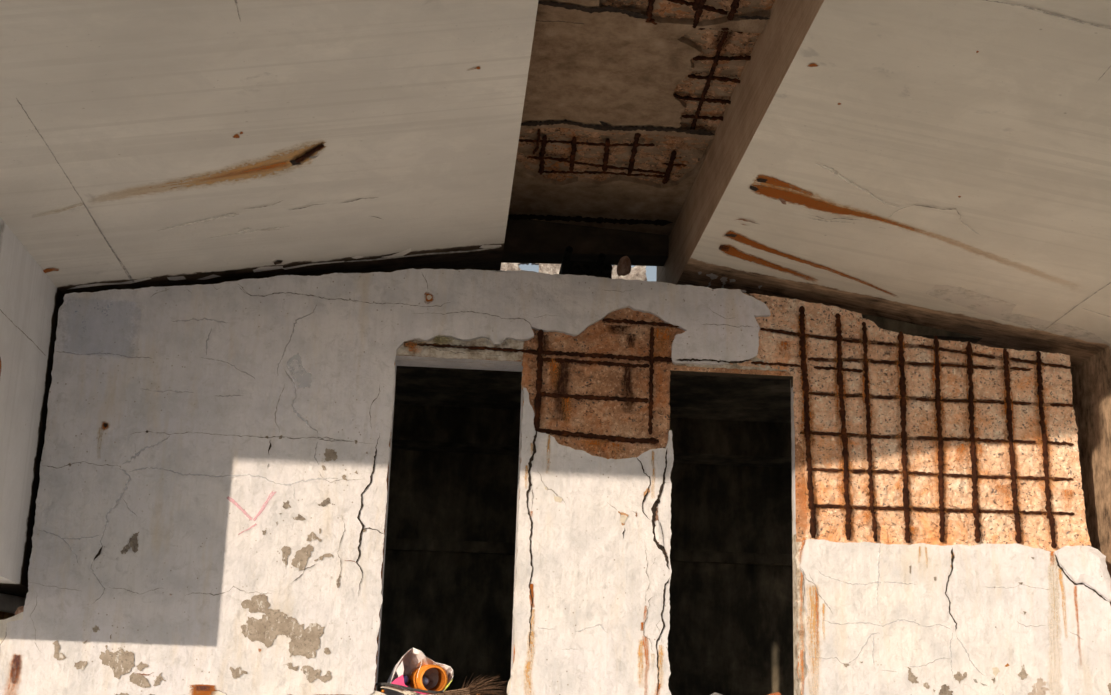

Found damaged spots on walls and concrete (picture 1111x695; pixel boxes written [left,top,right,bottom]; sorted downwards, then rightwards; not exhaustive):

spalling [645,0,751,130]
rust [163,142,325,188]
rust [719,231,892,295]
rust [750,175,933,236]
spalling [406,307,685,459]
peeling [53,625,166,695]
crack [30,279,541,653]
peeling [241,594,332,683]
crack [526,431,545,646]
crack [636,450,670,693]
crack [802,548,973,675]
spalling [730,285,1091,695]